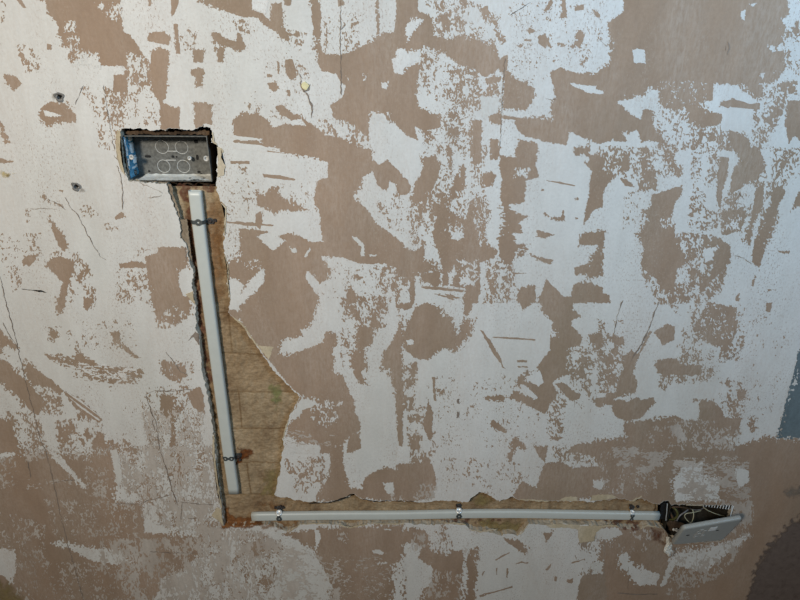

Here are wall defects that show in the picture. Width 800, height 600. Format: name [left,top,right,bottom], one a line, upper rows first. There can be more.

peeling [3,74,22,91]
peeling [15,39,41,74]
peeling [38,0,226,177]
crack [0,278,83,597]
peeling [0,215,497,600]
peeling [197,0,800,600]